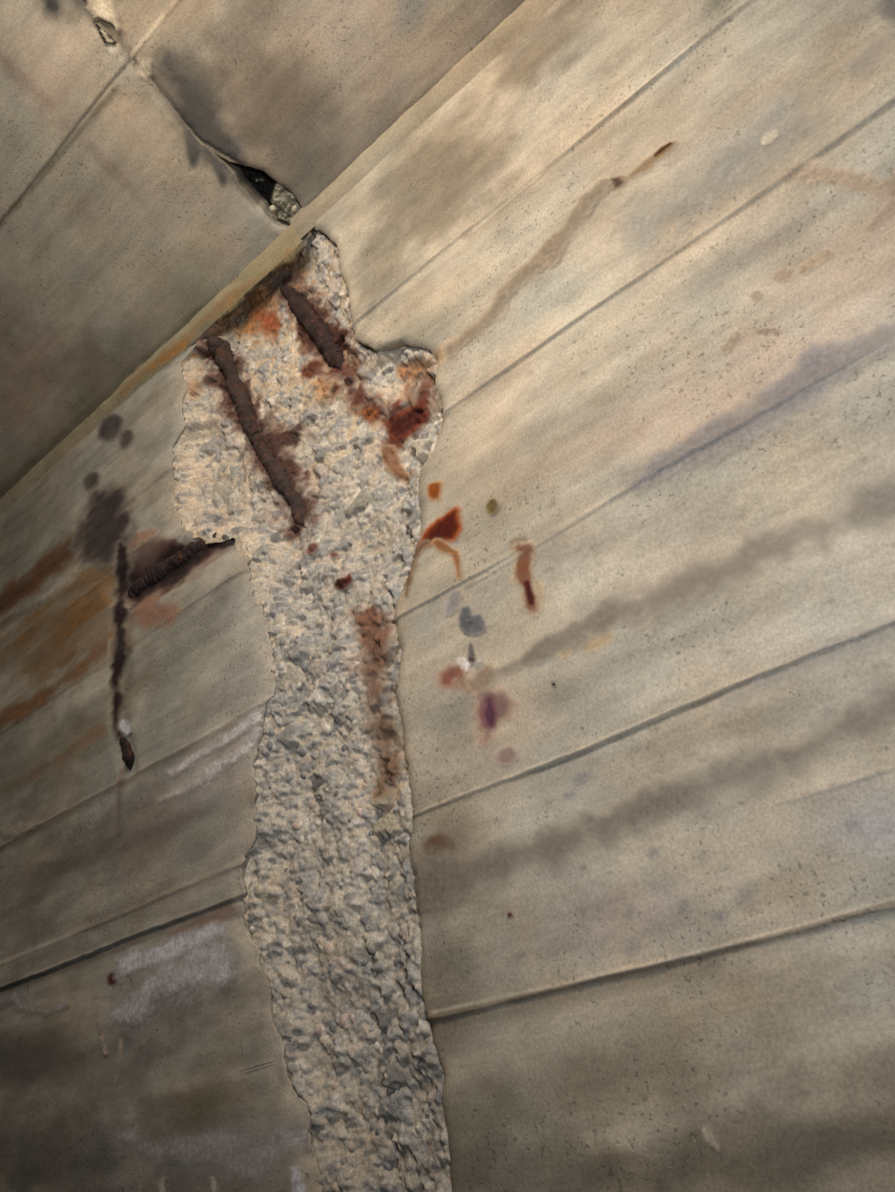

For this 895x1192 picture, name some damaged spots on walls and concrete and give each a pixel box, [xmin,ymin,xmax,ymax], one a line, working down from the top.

damp [41,0,86,17]
damp [159,48,247,186]
damp [83,472,100,490]
mould [98,413,134,448]
rust [116,241,437,557]
rust [0,482,233,729]
crack [108,541,132,738]
spalling [119,736,135,770]
spalling [128,229,452,1192]
rust [347,603,404,801]
rust [403,506,462,597]
rust [508,536,542,616]